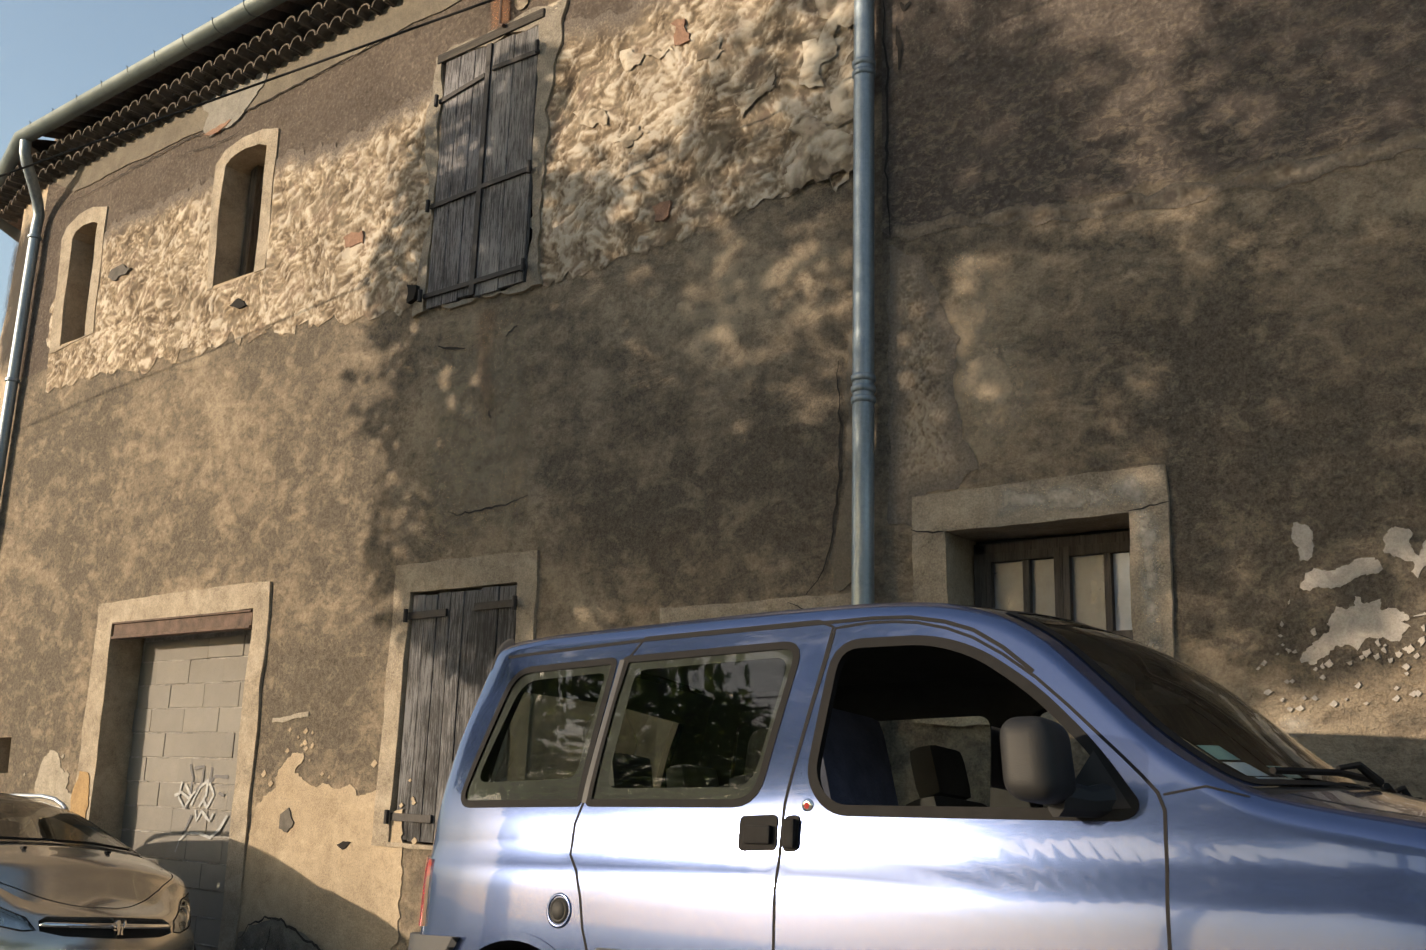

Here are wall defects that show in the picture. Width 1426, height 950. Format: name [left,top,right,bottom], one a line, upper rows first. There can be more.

spalling [46,86,443,393]
spalling [515,0,528,10]
spalling [529,0,854,292]
crack [882,1,911,232]
crack [787,361,842,609]
peeling [1256,522,1426,712]
peeling [238,727,418,950]